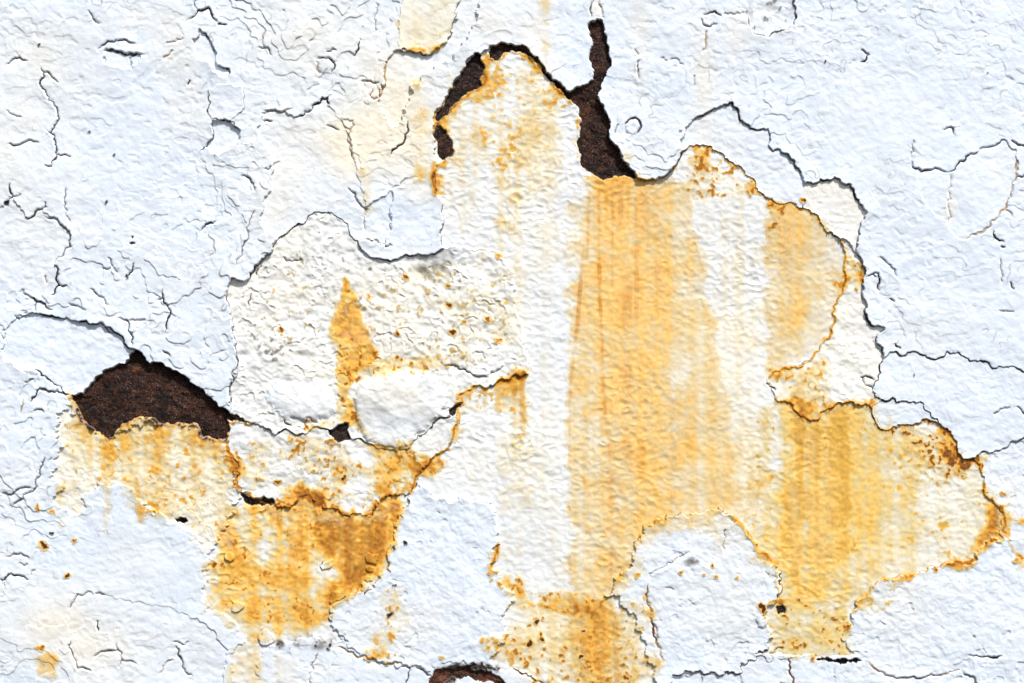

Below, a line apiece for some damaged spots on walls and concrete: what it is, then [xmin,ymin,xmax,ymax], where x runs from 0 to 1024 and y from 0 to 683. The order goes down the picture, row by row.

crack [5,57,69,163]
crack [89,1,227,63]
crack [264,3,378,160]
corrosion [407,44,443,54]
crack [21,369,68,413]
crack [2,182,171,357]
corrosion [64,266,529,683]
peeling [0,0,616,683]
corrosion [415,20,1024,683]
peeling [654,102,1024,683]
crack [912,140,1024,312]
peeling [609,586,657,683]